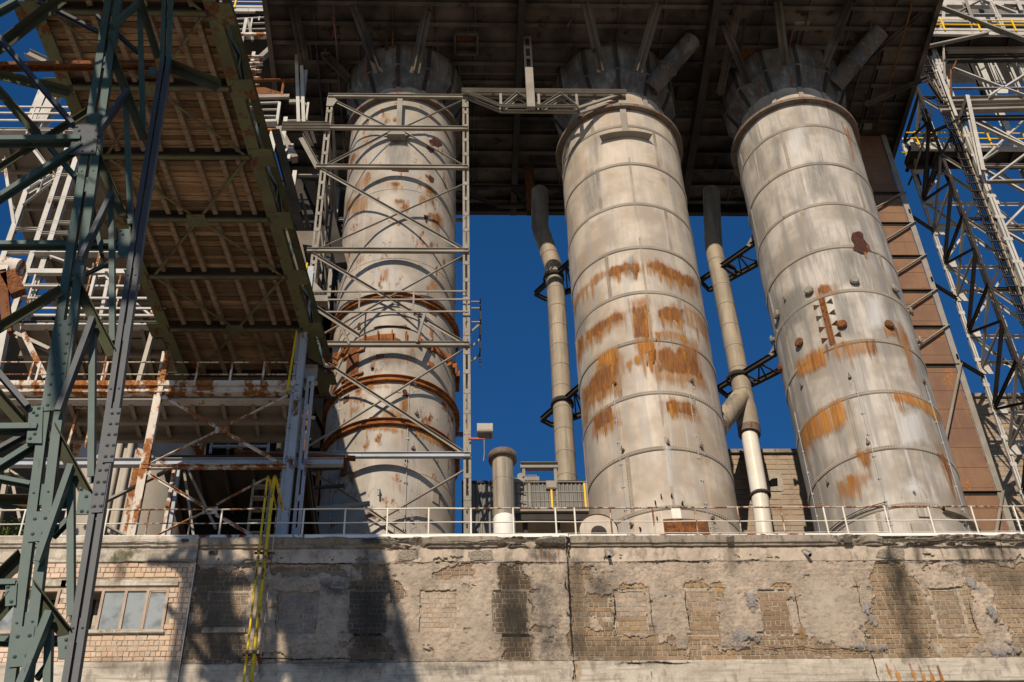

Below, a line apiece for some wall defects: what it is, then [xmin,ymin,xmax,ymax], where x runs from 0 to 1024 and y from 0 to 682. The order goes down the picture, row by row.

crack [226,536,655,680]
peeling [432,537,565,661]
peeling [558,538,1024,661]